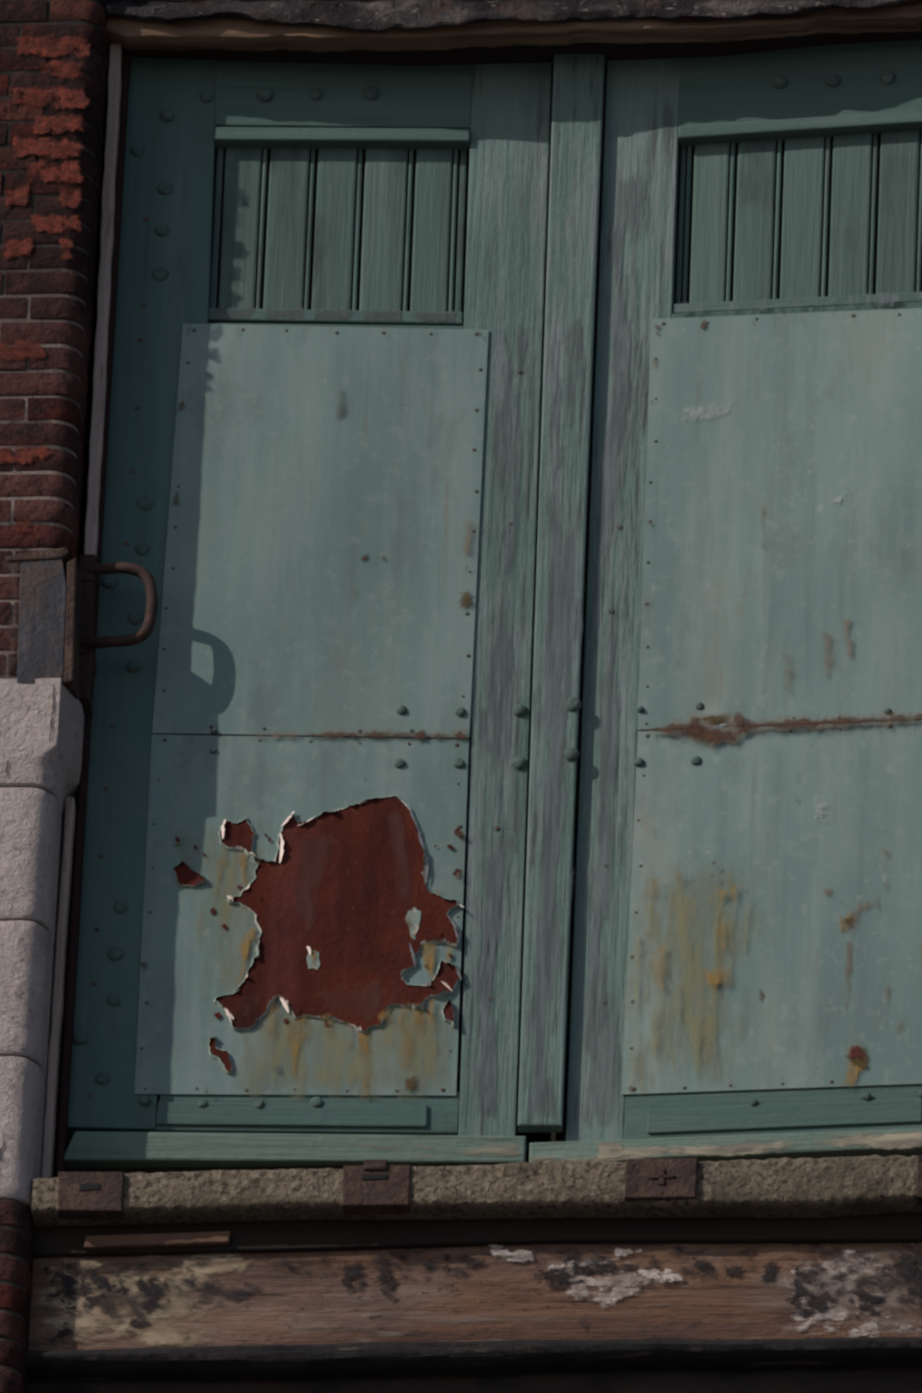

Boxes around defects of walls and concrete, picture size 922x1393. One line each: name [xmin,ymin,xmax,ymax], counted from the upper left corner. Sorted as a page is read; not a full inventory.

rust [651,712,922,745]
peeling [172,836,208,888]
peeling [210,795,464,1034]
peeling [208,1036,234,1075]
leakage [44,1262,259,1341]
leakage [282,1248,485,1301]
leakage [533,1242,922,1320]